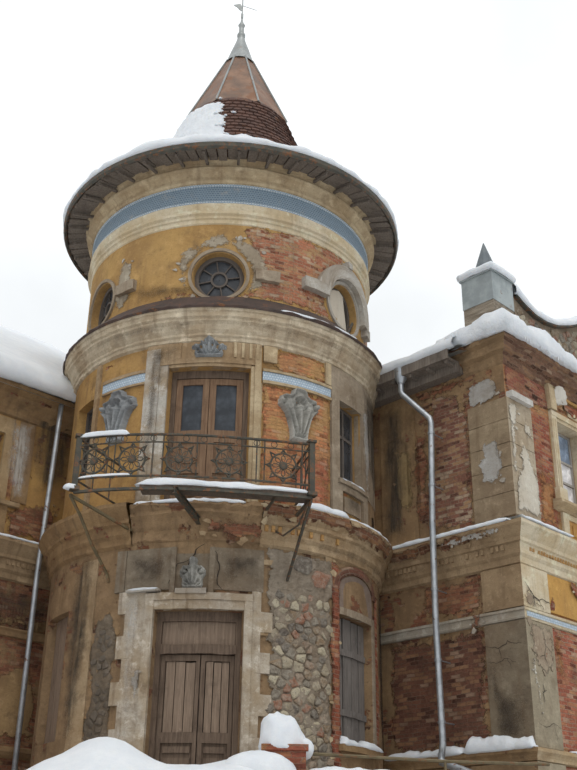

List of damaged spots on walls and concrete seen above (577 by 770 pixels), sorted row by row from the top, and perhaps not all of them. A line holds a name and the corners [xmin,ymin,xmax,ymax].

spalling [161,226,343,323]
spalling [393,365,547,548]
peeling [509,403,557,527]